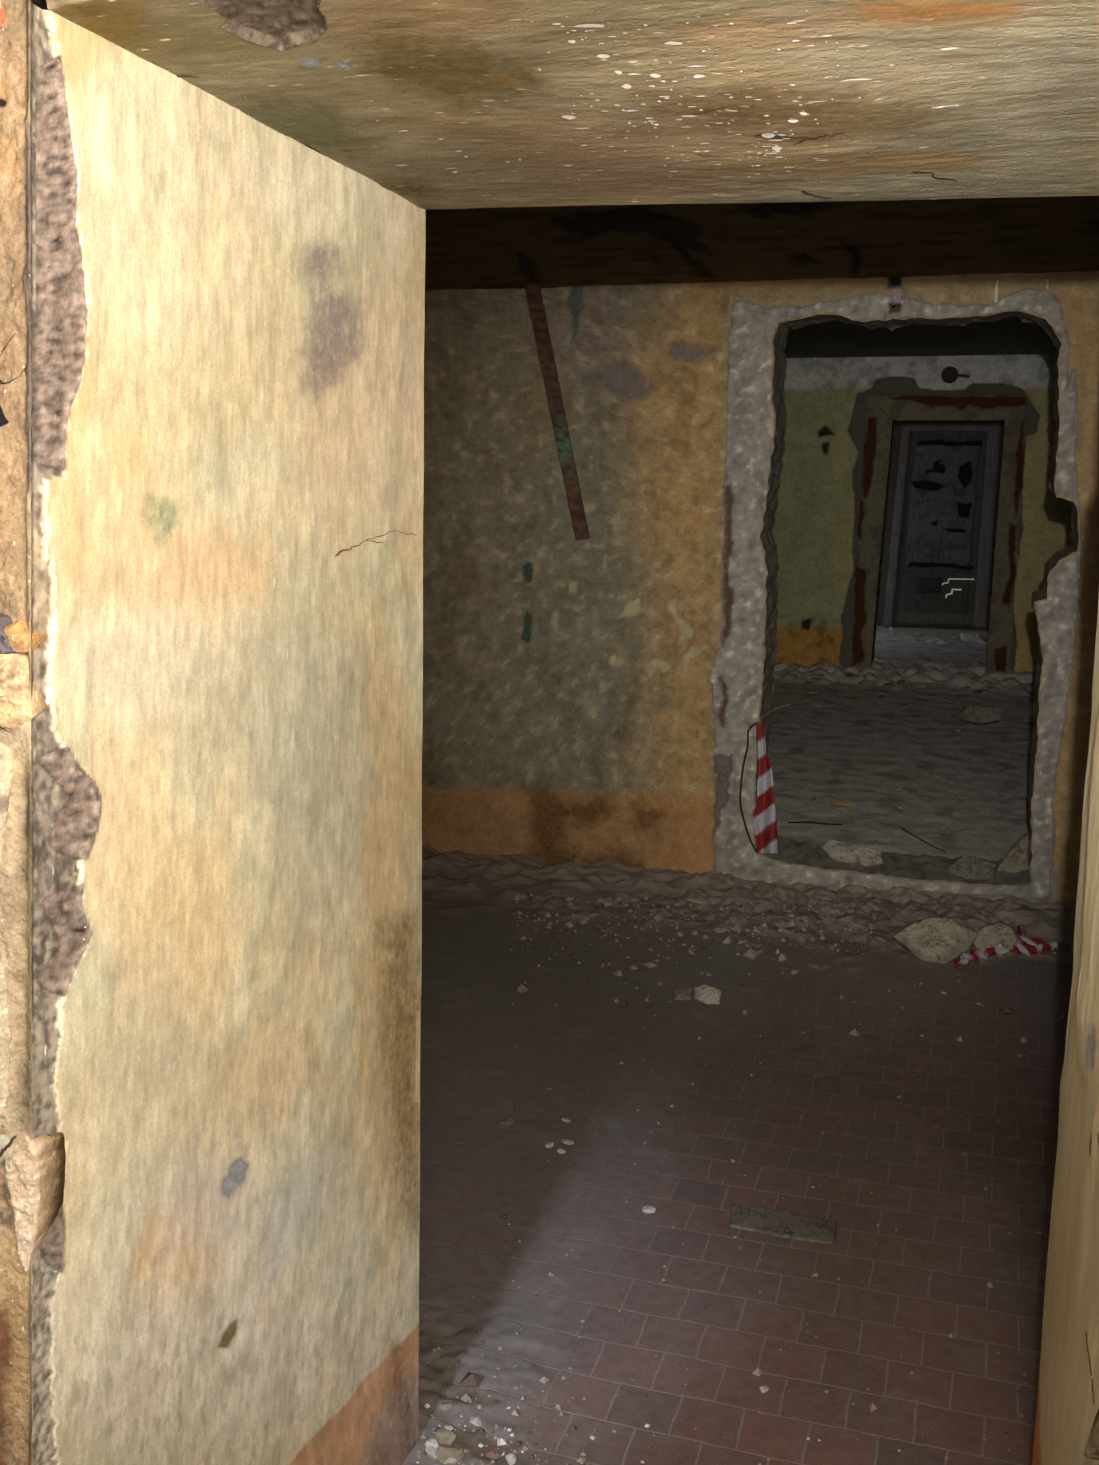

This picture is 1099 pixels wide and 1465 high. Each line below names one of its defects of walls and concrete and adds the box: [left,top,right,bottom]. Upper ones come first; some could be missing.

flaking render [204,0,327,52]
peeling [619,599,642,618]
flaking render [645,289,1082,899]
flaking render [37,747,101,859]
flaking render [38,884,92,997]
crack [1086,1332,1094,1404]